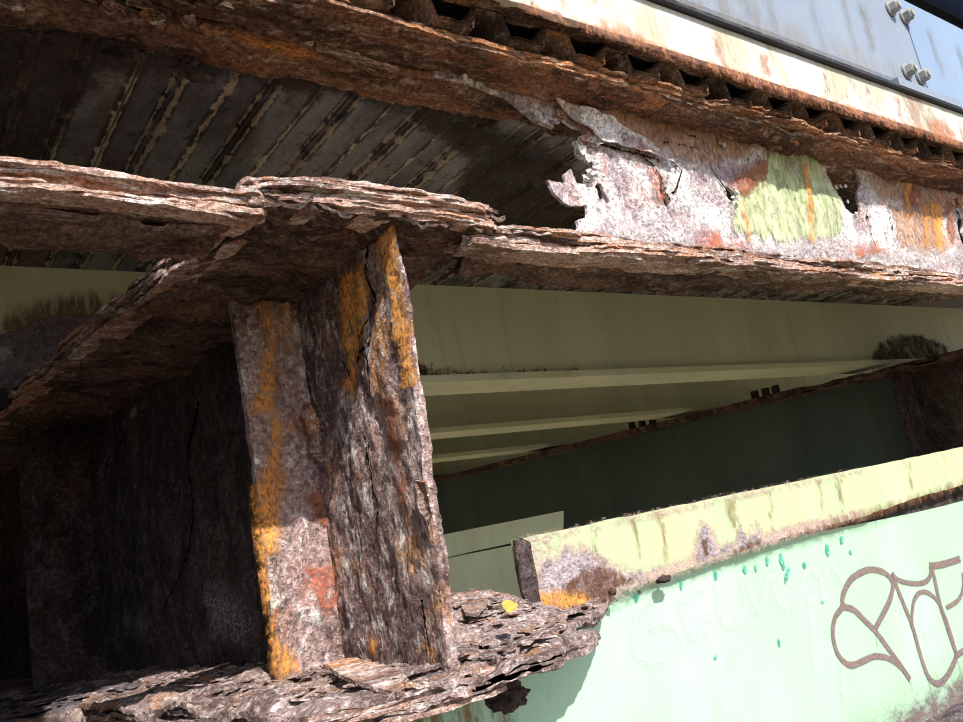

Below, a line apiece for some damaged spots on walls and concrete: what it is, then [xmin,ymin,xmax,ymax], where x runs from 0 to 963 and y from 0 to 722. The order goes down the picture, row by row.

corrosion [0,0,963,425]
crack [600,132,730,200]
peeling [731,151,858,242]
crack [342,246,376,397]
corrosion [251,300,289,601]
corrosion [293,402,324,463]
corrosion [383,392,433,521]
corrosion [305,551,338,608]
corrosion [512,487,902,609]
corrosion [271,620,299,673]
corrosion [563,629,601,661]
corrosion [304,681,511,722]